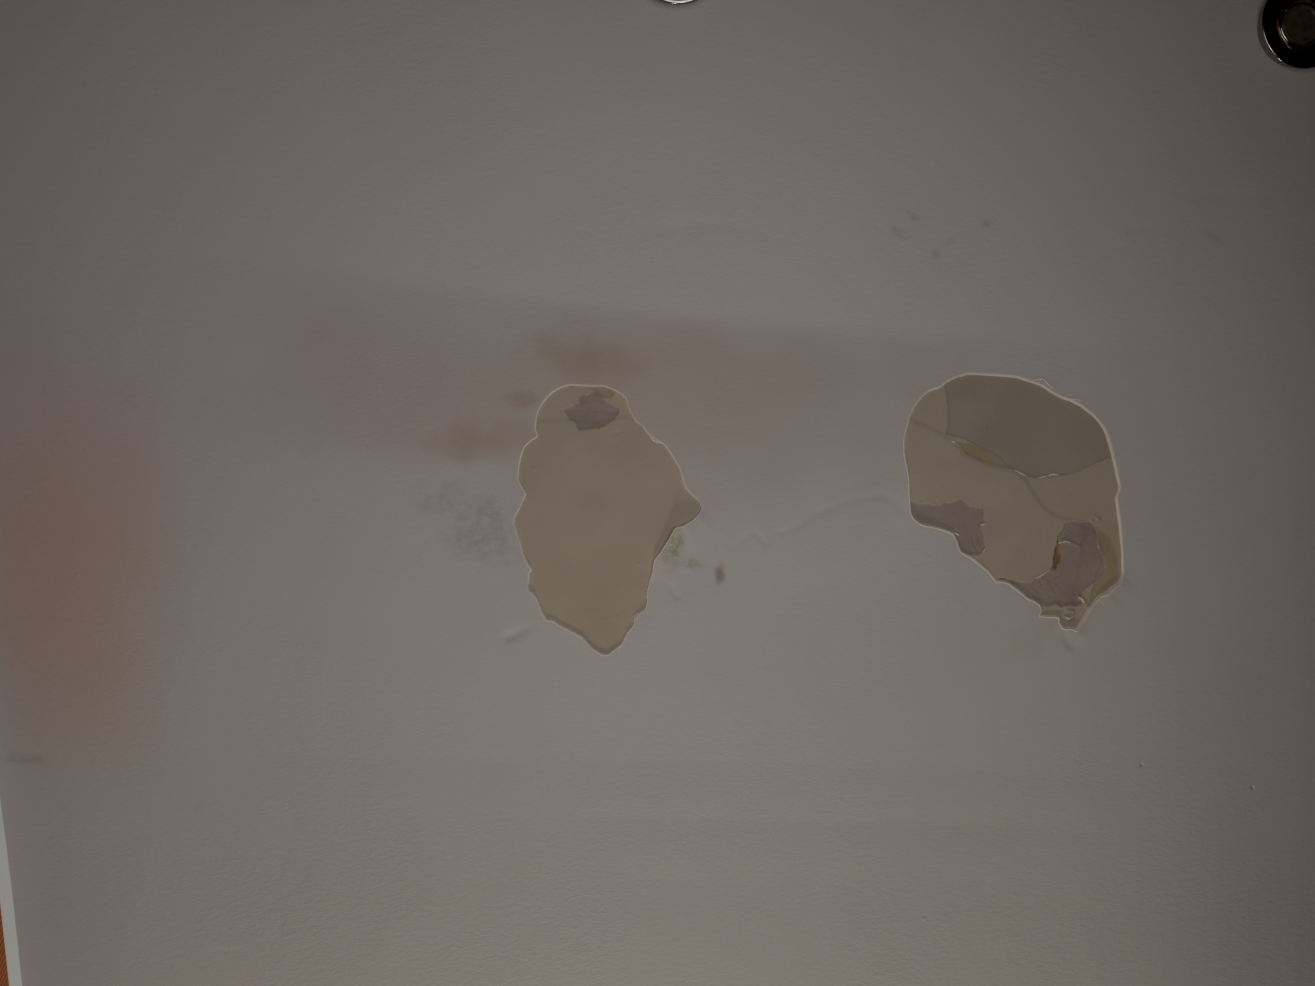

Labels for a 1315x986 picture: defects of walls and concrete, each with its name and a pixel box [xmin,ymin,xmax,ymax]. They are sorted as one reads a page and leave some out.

peeling [513,384,702,656]
peeling [903,373,1125,632]